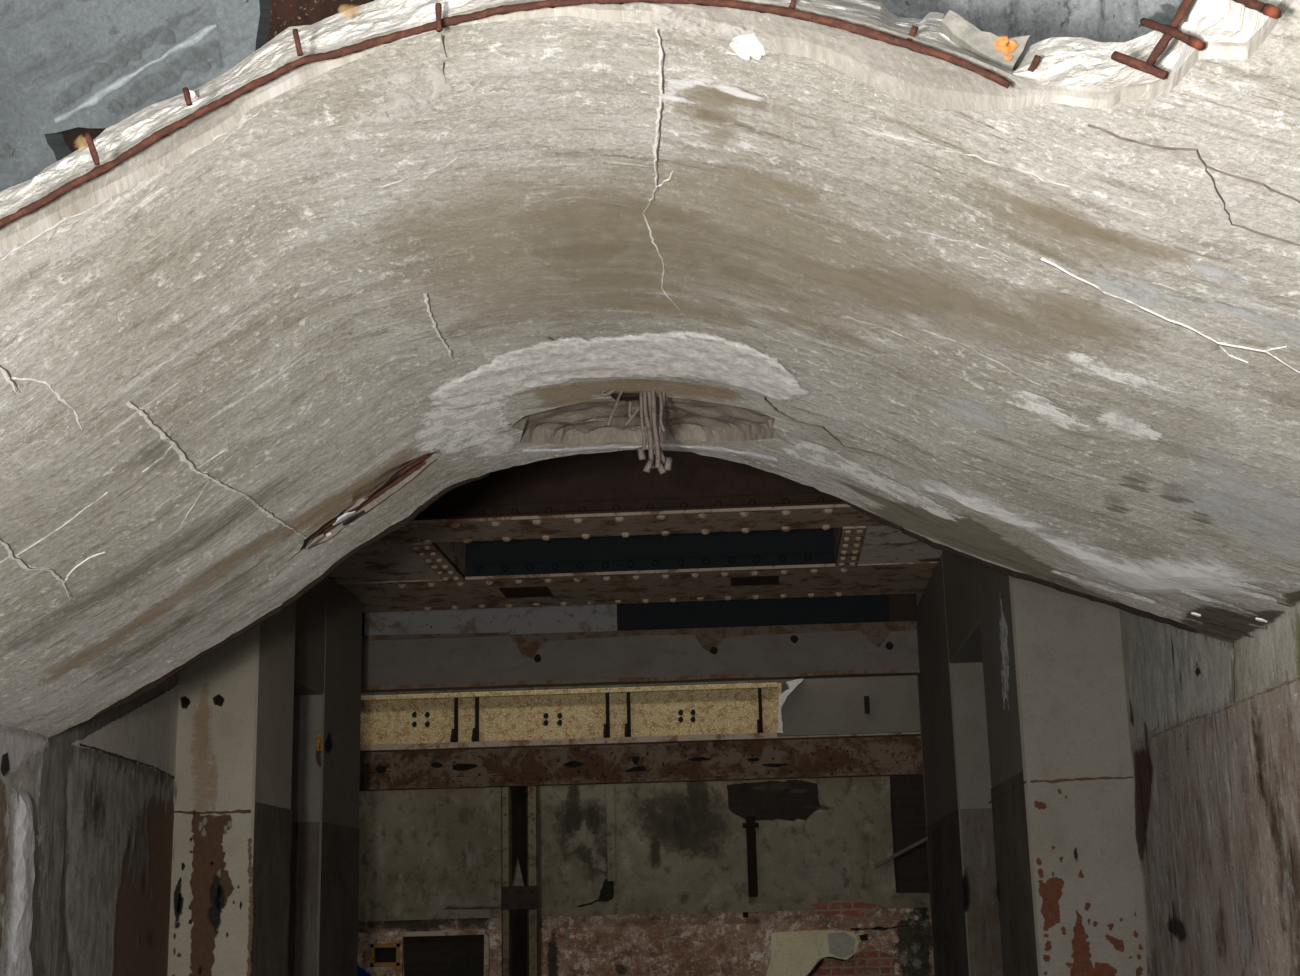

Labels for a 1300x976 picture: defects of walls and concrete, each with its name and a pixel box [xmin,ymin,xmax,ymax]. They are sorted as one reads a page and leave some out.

spalling [0,0,1295,253]
crack [641,28,680,310]
crack [1088,124,1300,246]
crack [1040,258,1300,374]
crack [0,366,82,430]
crack [0,492,108,599]
crack [126,401,308,538]
spalling [282,444,447,566]
spalling [511,397,781,463]
flaking render [806,946,896,976]